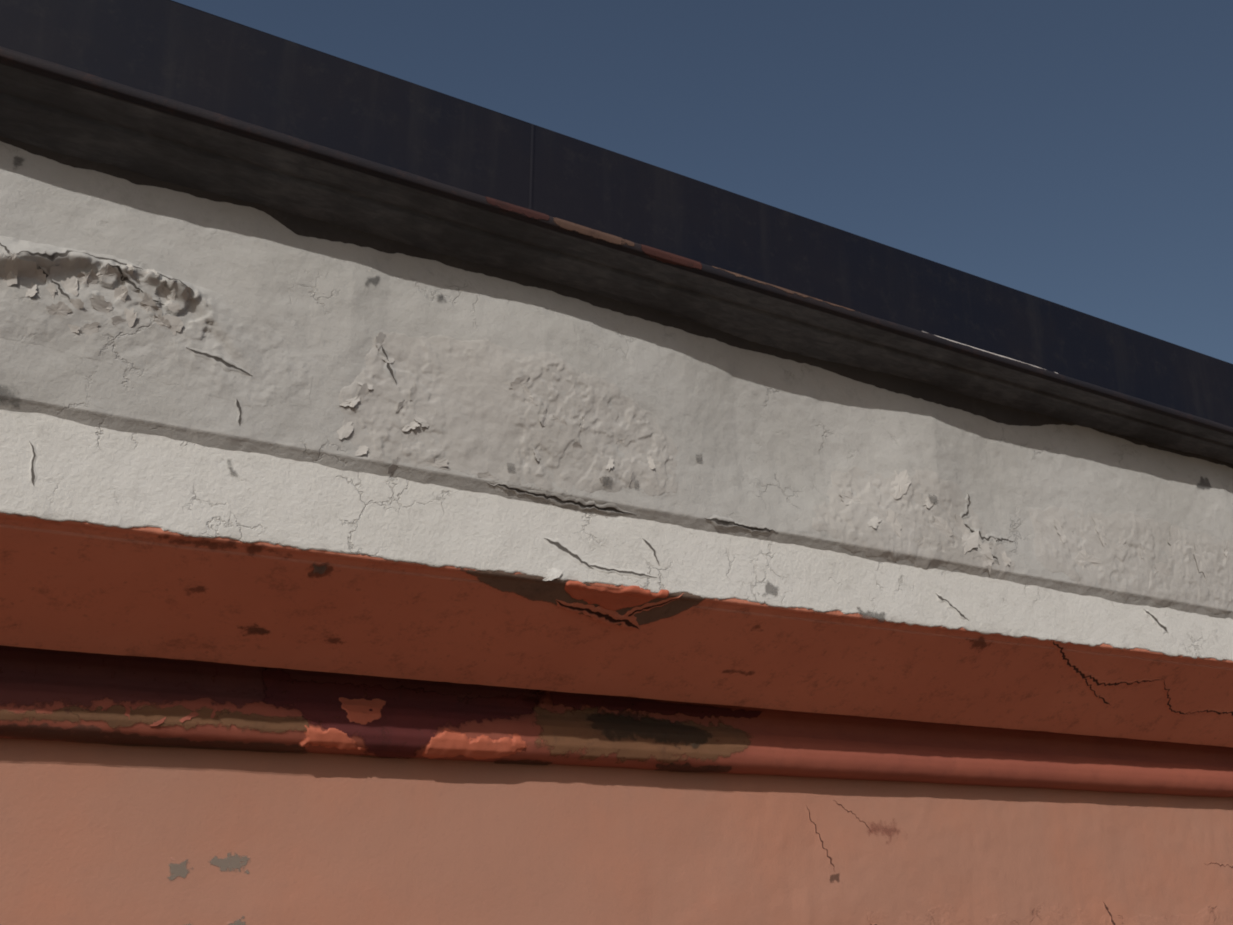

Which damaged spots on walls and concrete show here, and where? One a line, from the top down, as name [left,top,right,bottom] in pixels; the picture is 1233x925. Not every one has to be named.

peeling [337,332,678,496]
crack [488,482,660,579]
spalling [463,568,705,630]
peeling [0,645,762,764]
crack [1051,640,1233,718]
peeling [168,857,189,880]
peeling [210,853,249,874]
crack [806,800,871,872]